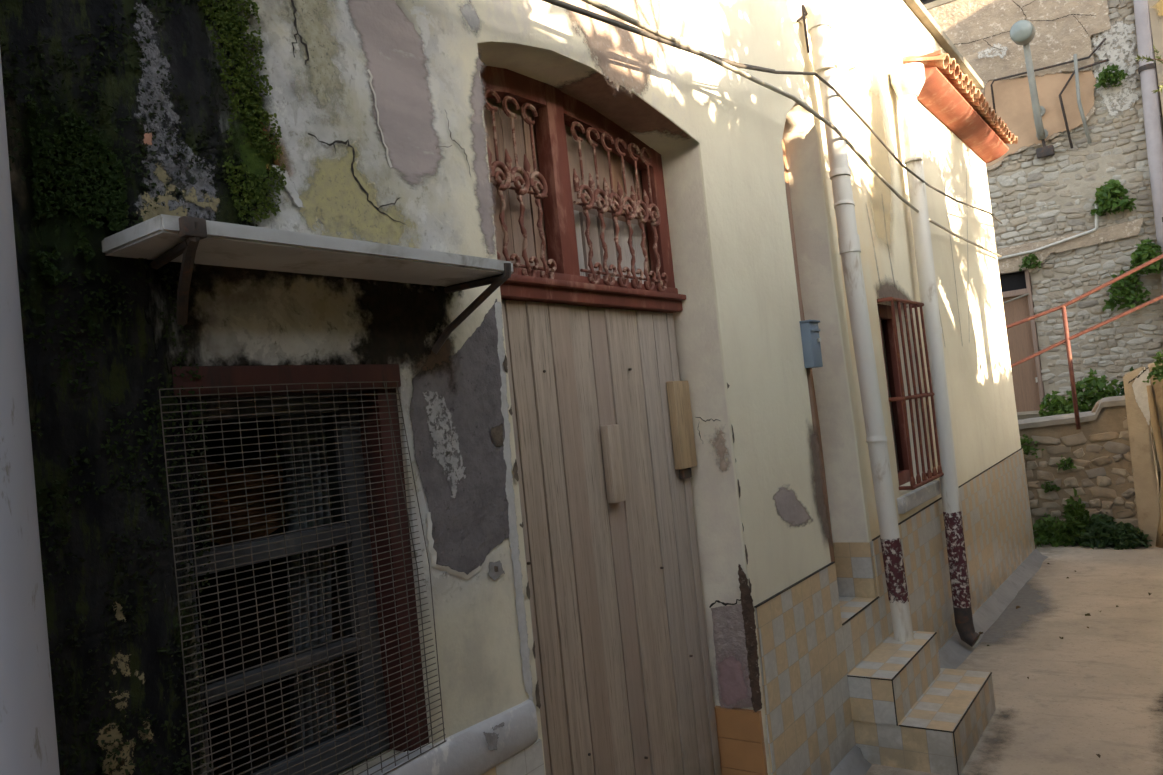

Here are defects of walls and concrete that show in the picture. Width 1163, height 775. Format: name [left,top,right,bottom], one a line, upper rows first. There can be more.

crack [291,0,309,65]
peeling [347,0,443,186]
peeling [563,0,687,95]
crack [308,133,406,225]
mould [0,0,462,775]
spalling [410,299,541,709]
peeling [773,487,813,527]
spalling [710,545,762,712]